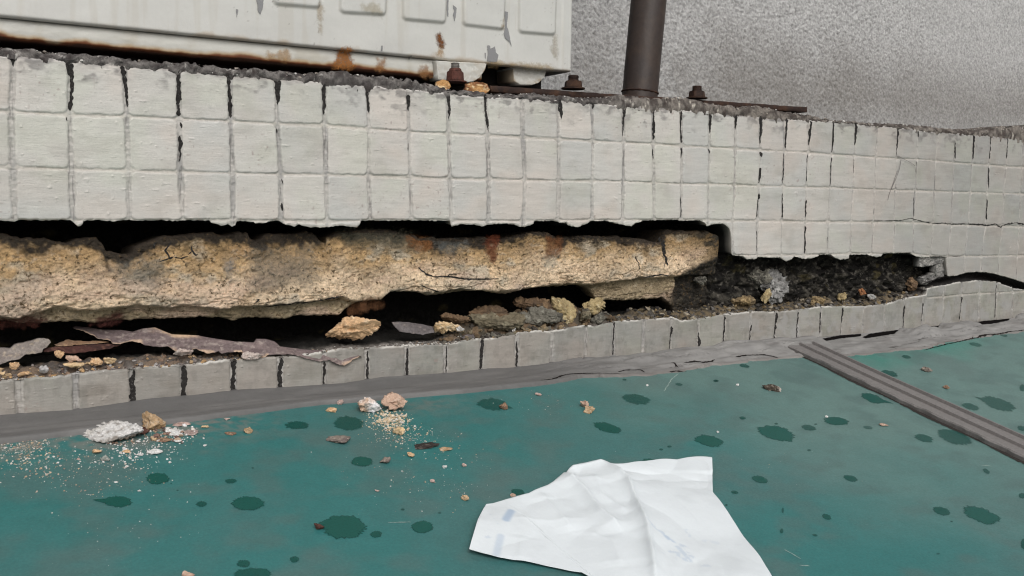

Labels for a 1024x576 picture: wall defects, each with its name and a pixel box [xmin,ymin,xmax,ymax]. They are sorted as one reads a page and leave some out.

crack [878,218,1024,228]
crack [418,267,498,292]
spalling [0,220,947,380]
crack [926,330,1022,350]